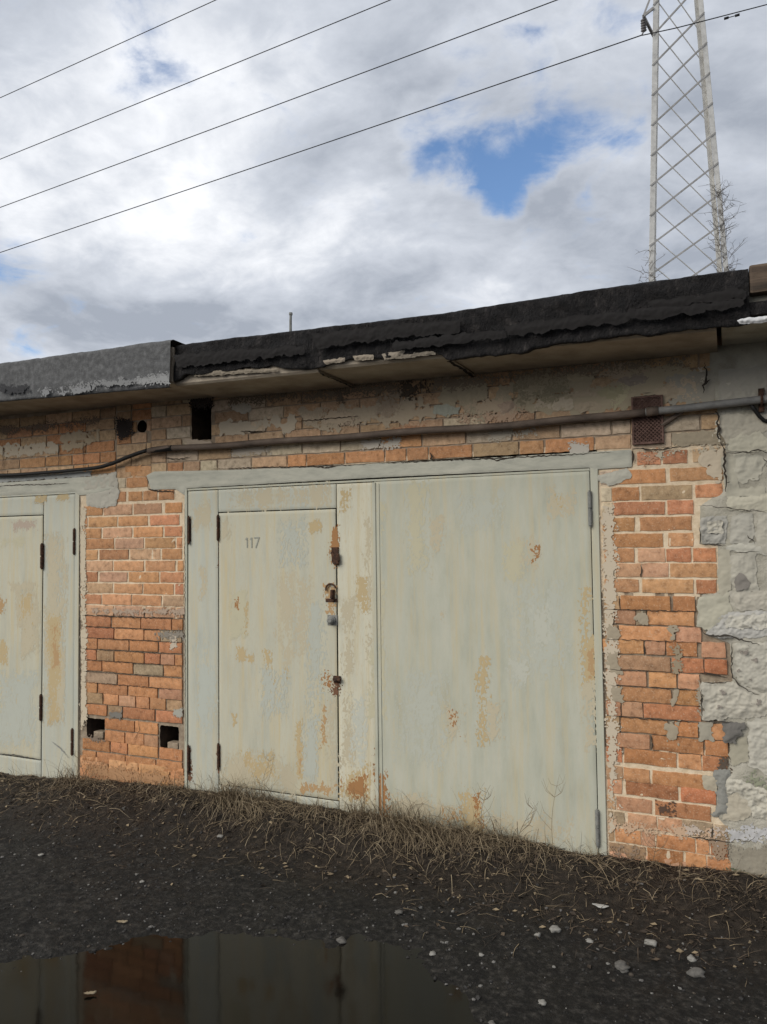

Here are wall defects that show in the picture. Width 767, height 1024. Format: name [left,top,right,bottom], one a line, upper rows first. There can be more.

peeling [173,287,747,377]
peeling [712,420,767,452]
spalling [700,515,728,544]
spalling [734,573,751,591]
peeling [706,610,767,662]
corrosion [191,480,577,846]